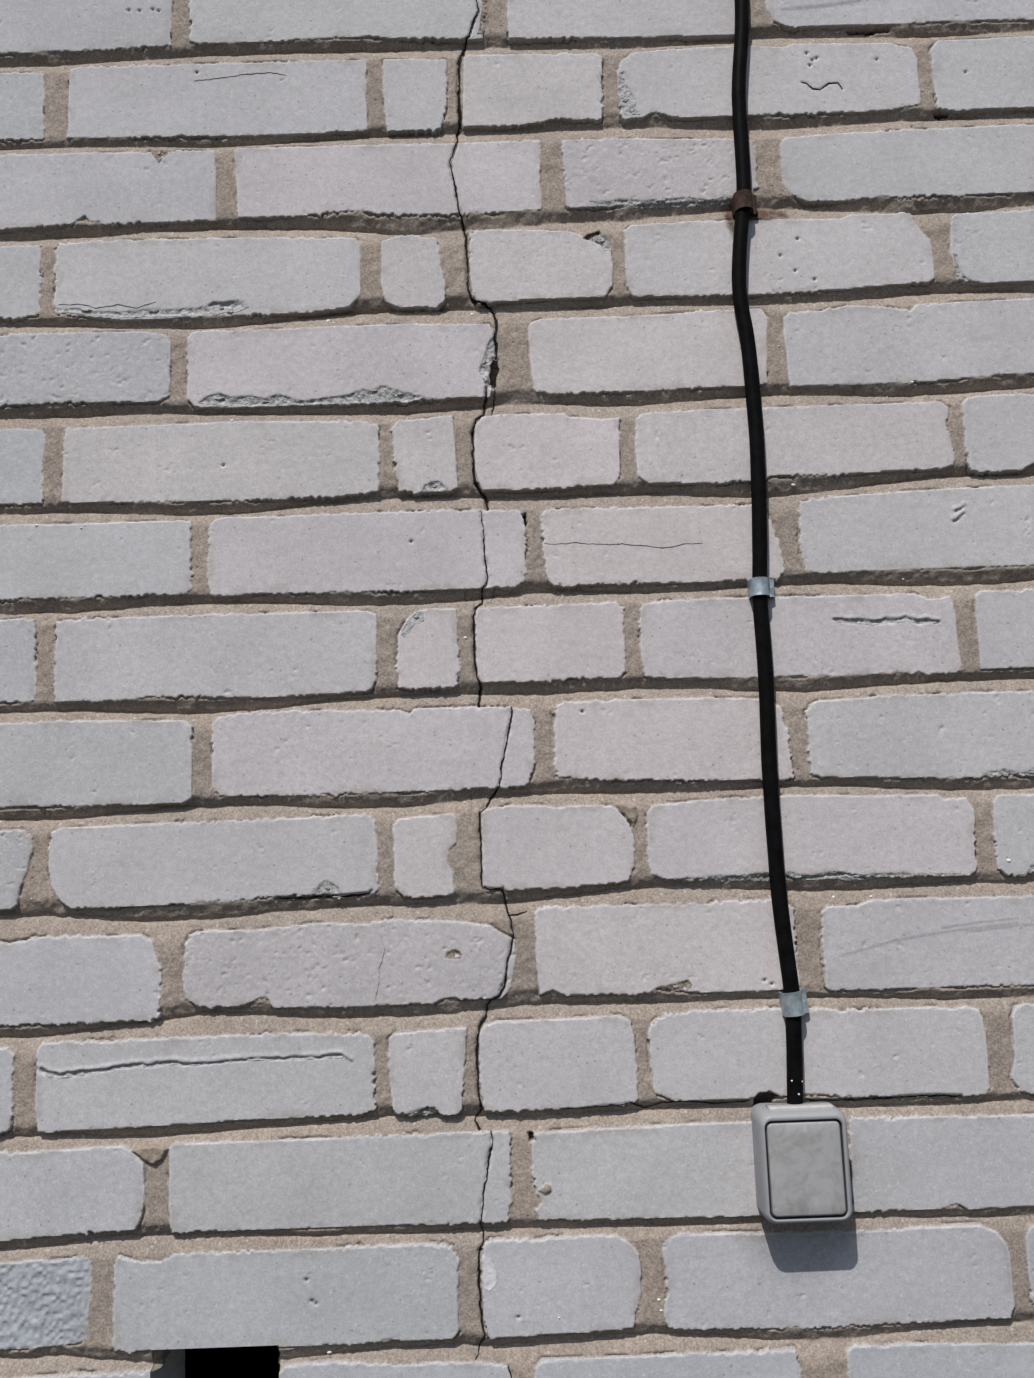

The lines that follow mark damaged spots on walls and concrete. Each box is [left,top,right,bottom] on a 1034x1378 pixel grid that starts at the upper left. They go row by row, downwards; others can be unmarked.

spalling [56,301,249,318]
spalling [198,385,431,409]
crack [449,0,526,1377]